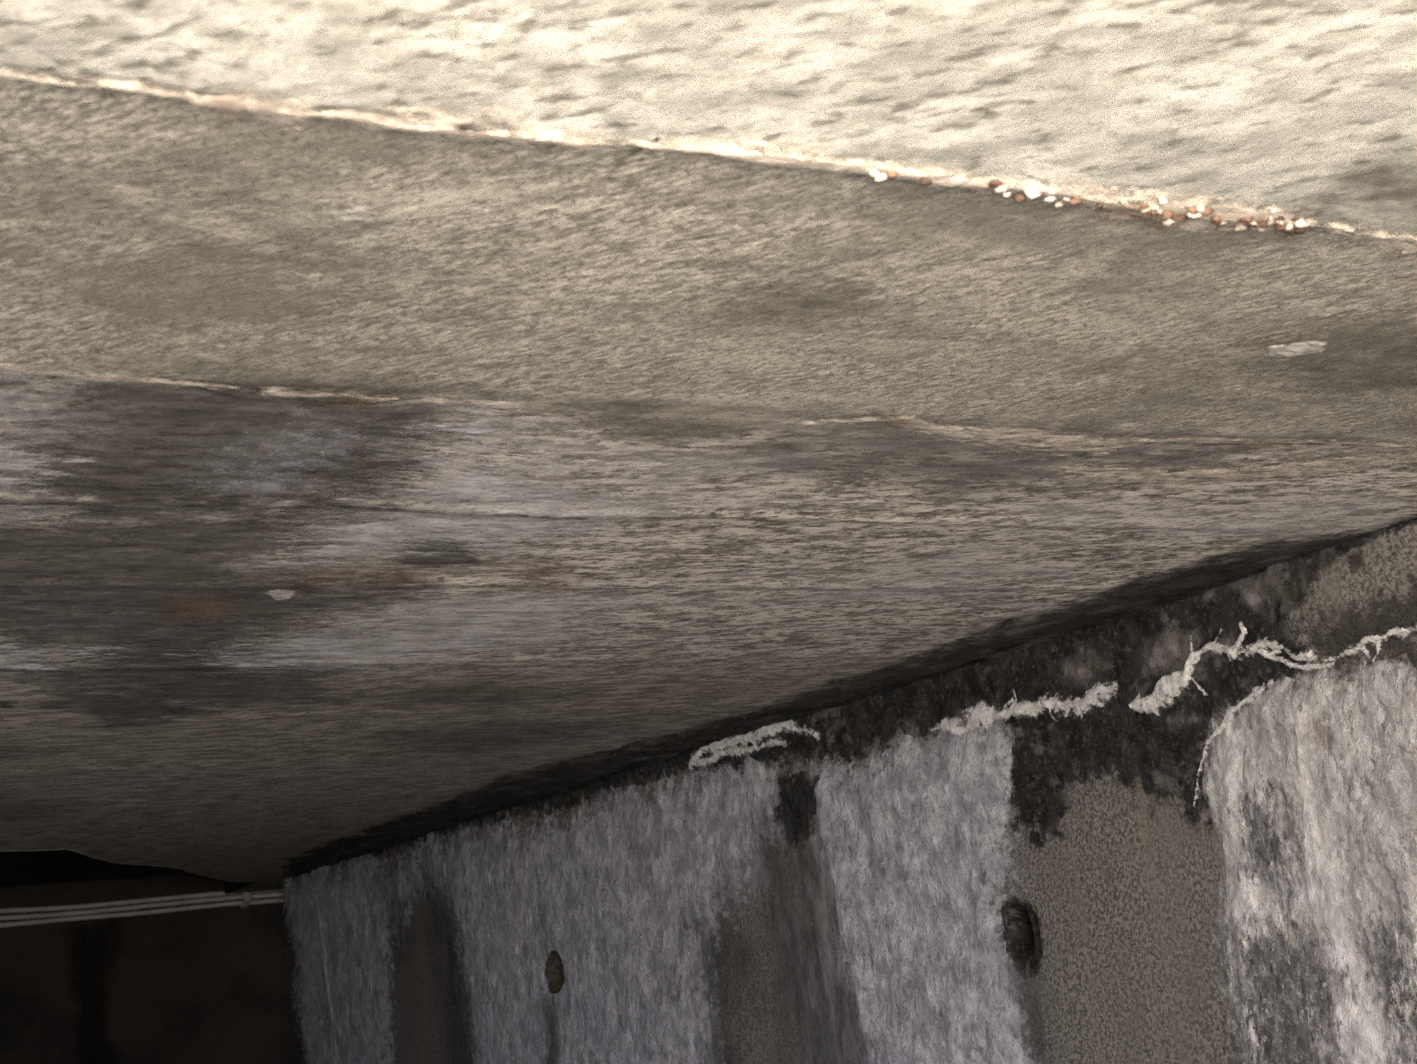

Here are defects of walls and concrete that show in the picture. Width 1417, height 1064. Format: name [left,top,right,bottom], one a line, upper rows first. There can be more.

damp [0,381,649,729]
damp [281,531,1417,1064]